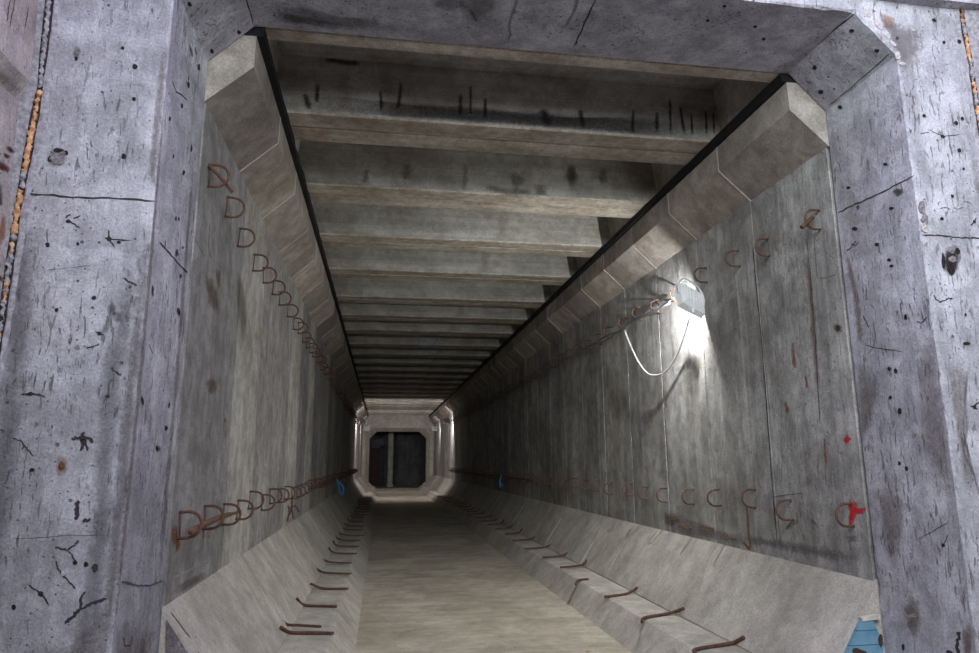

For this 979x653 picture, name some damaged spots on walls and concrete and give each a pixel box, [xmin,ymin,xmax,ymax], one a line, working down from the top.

crack [574,0,596,46]
spalling [942,246,960,275]